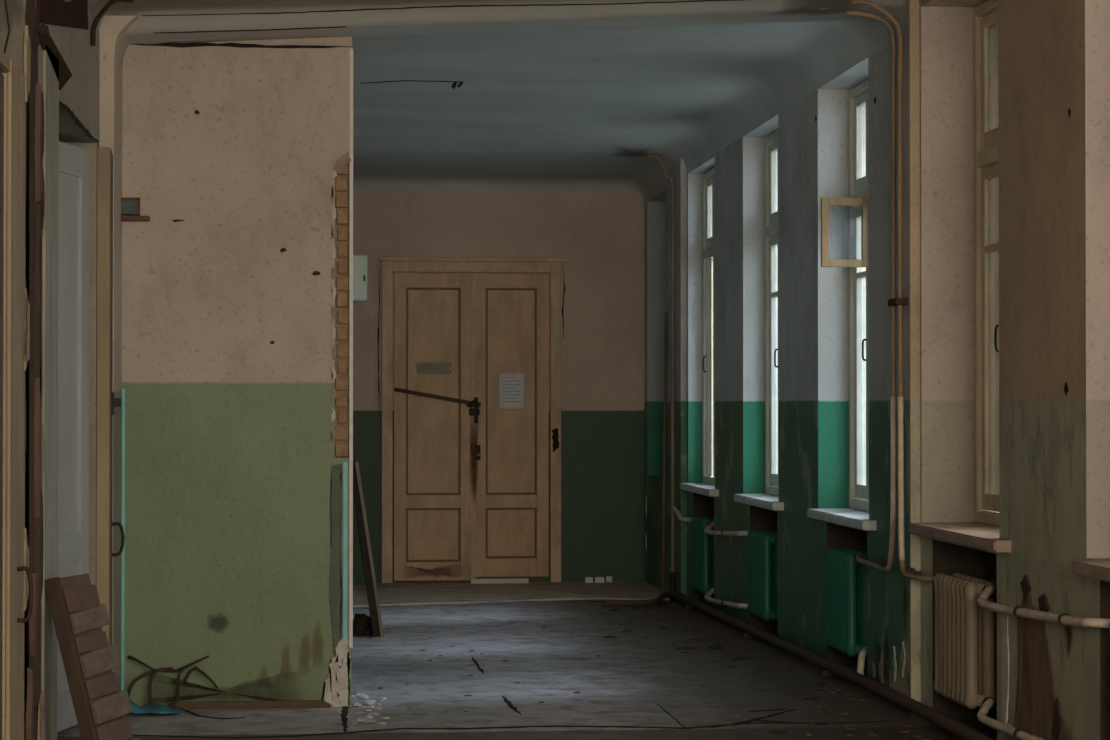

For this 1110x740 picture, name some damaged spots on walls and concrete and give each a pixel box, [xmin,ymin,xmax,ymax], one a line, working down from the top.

spalling [24,0,45,740]
flaking render [311,151,351,707]
spalling [1001,574,1063,740]